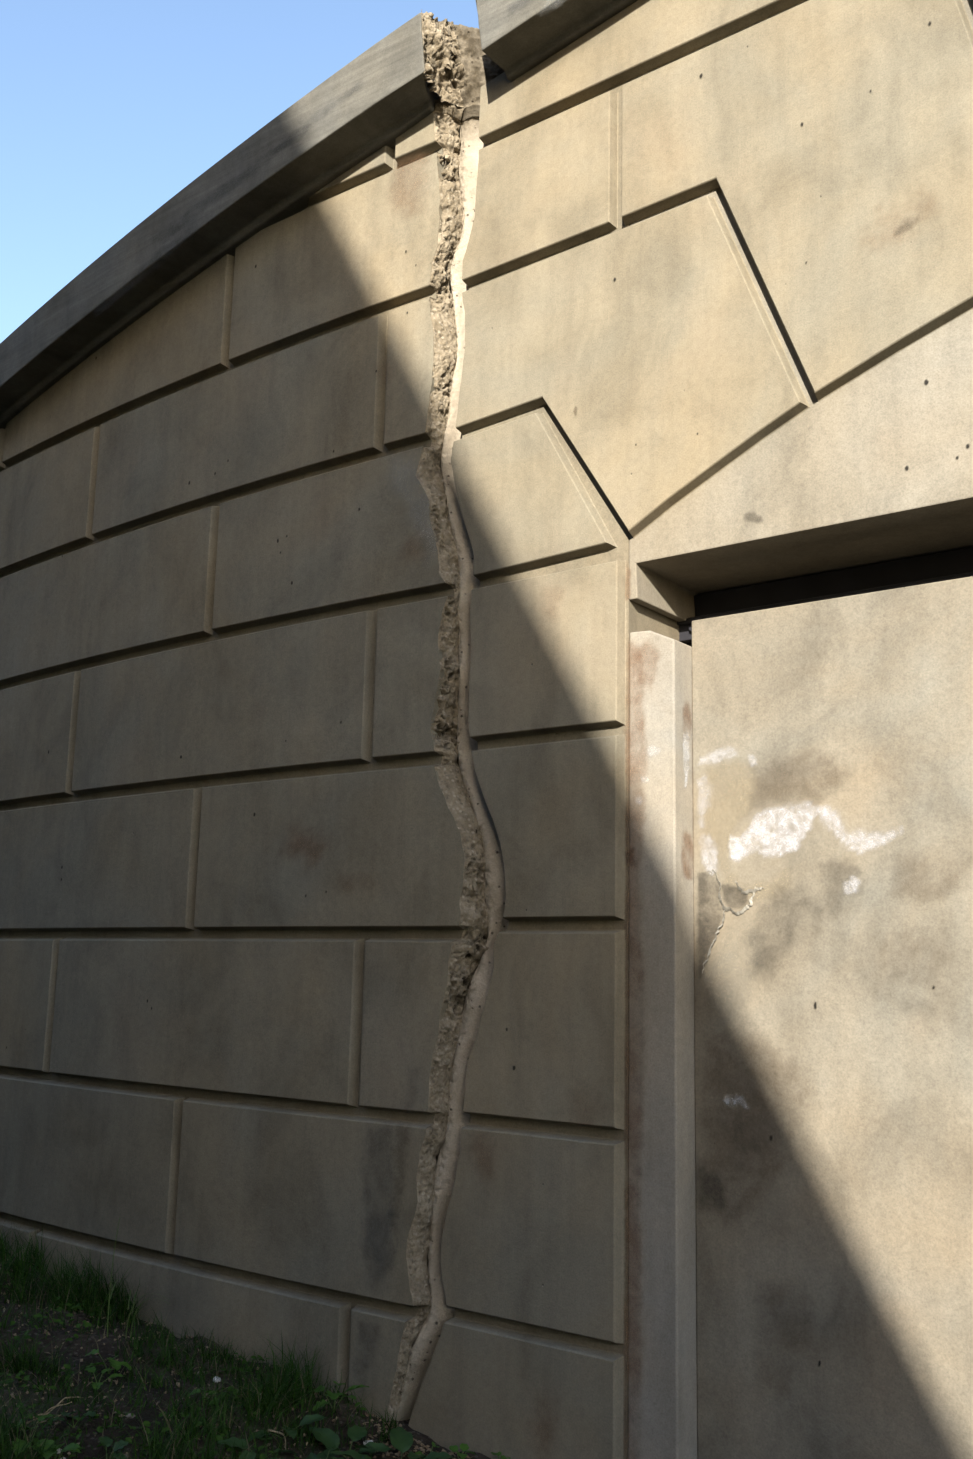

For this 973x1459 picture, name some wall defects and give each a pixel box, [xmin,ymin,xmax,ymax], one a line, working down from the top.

crack [387,24,509,1421]
leakage [733,809,839,858]
peeling [698,869,765,973]